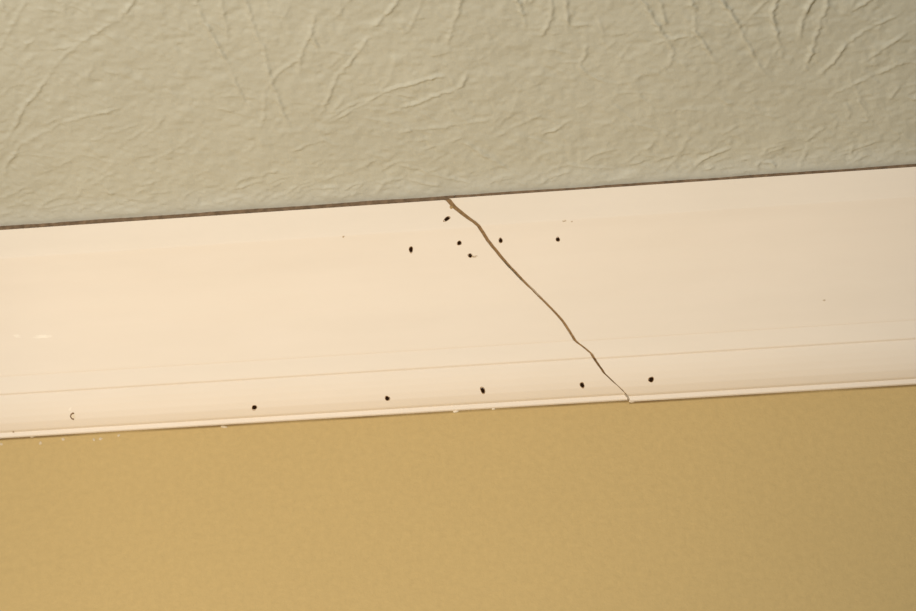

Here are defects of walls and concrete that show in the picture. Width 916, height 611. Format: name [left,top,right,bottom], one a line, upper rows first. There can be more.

crack [446,199,627,395]